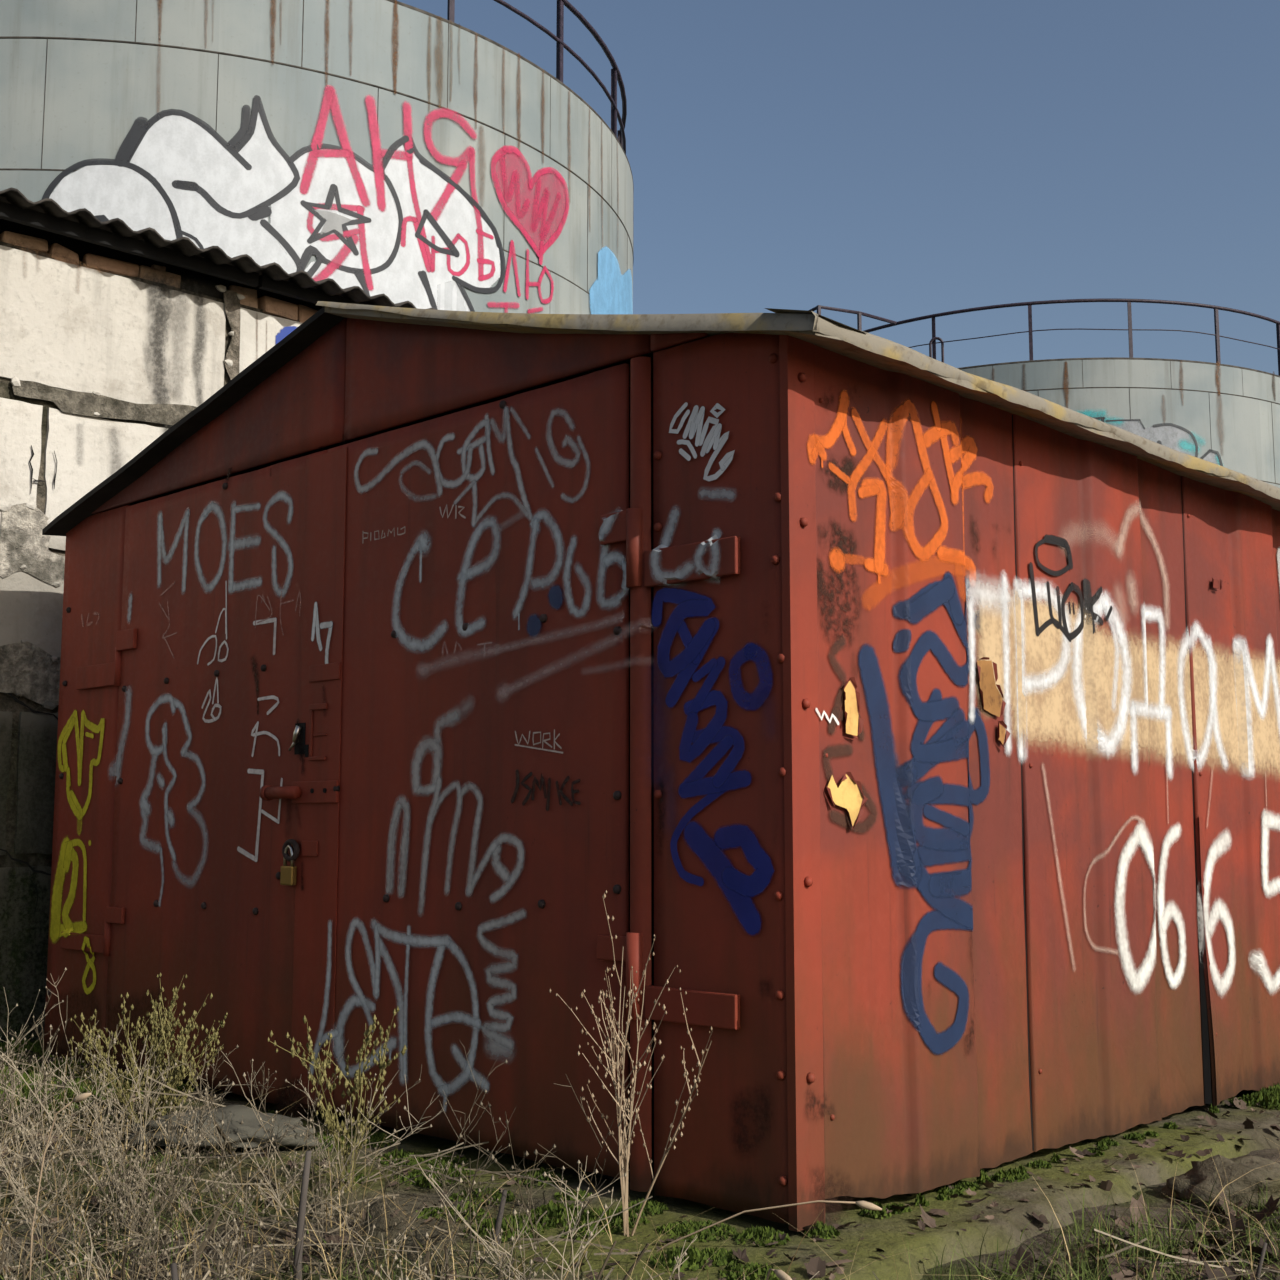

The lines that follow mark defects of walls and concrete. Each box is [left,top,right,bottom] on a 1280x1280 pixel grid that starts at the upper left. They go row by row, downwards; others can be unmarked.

rust [503,54,521,150]
damp [137,275,215,404]
rust [826,458,861,491]
spalling [0,501,65,587]
rust [817,523,857,638]
spalling [0,639,61,710]